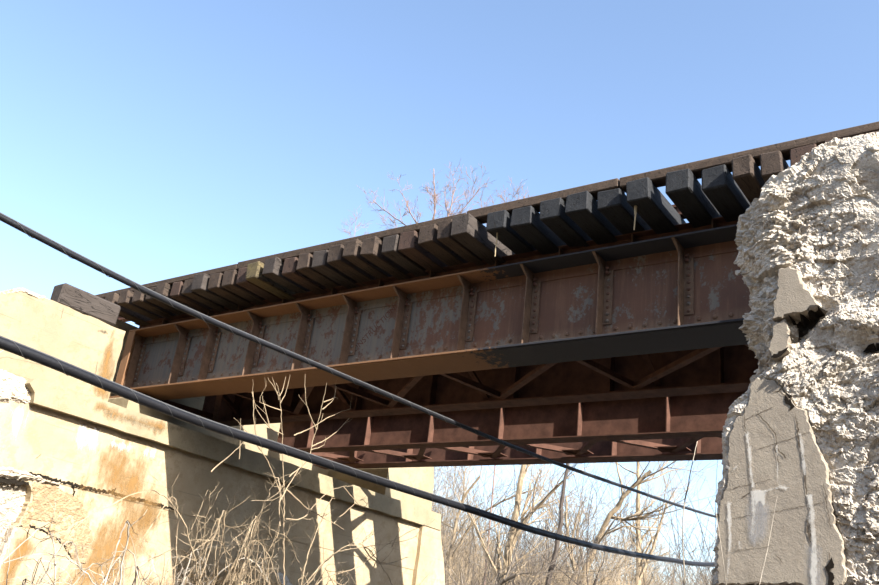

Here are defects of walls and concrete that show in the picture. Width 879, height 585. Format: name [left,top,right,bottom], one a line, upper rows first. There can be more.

spalling [0,369,31,404]
spalling [752,131,879,585]
spalling [0,466,91,567]
spalling [711,389,750,585]
crack [724,387,834,585]